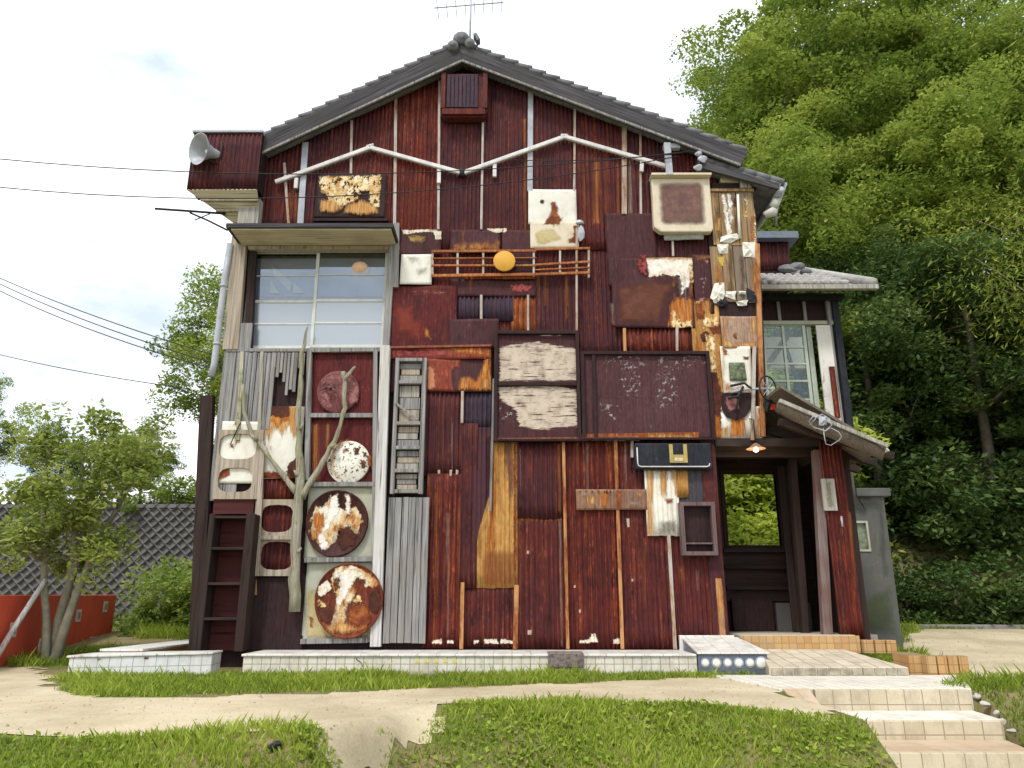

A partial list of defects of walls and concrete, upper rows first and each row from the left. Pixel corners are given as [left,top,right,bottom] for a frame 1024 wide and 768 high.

peeling [319,174,382,214]
rust [536,202,578,243]
rust [397,348,491,391]
peeling [498,335,577,430]
rust [619,283,760,437]
rust [337,512,358,550]
rust [484,442,562,586]
rust [587,470,678,535]
rust [317,604,334,624]
rust [348,579,381,632]